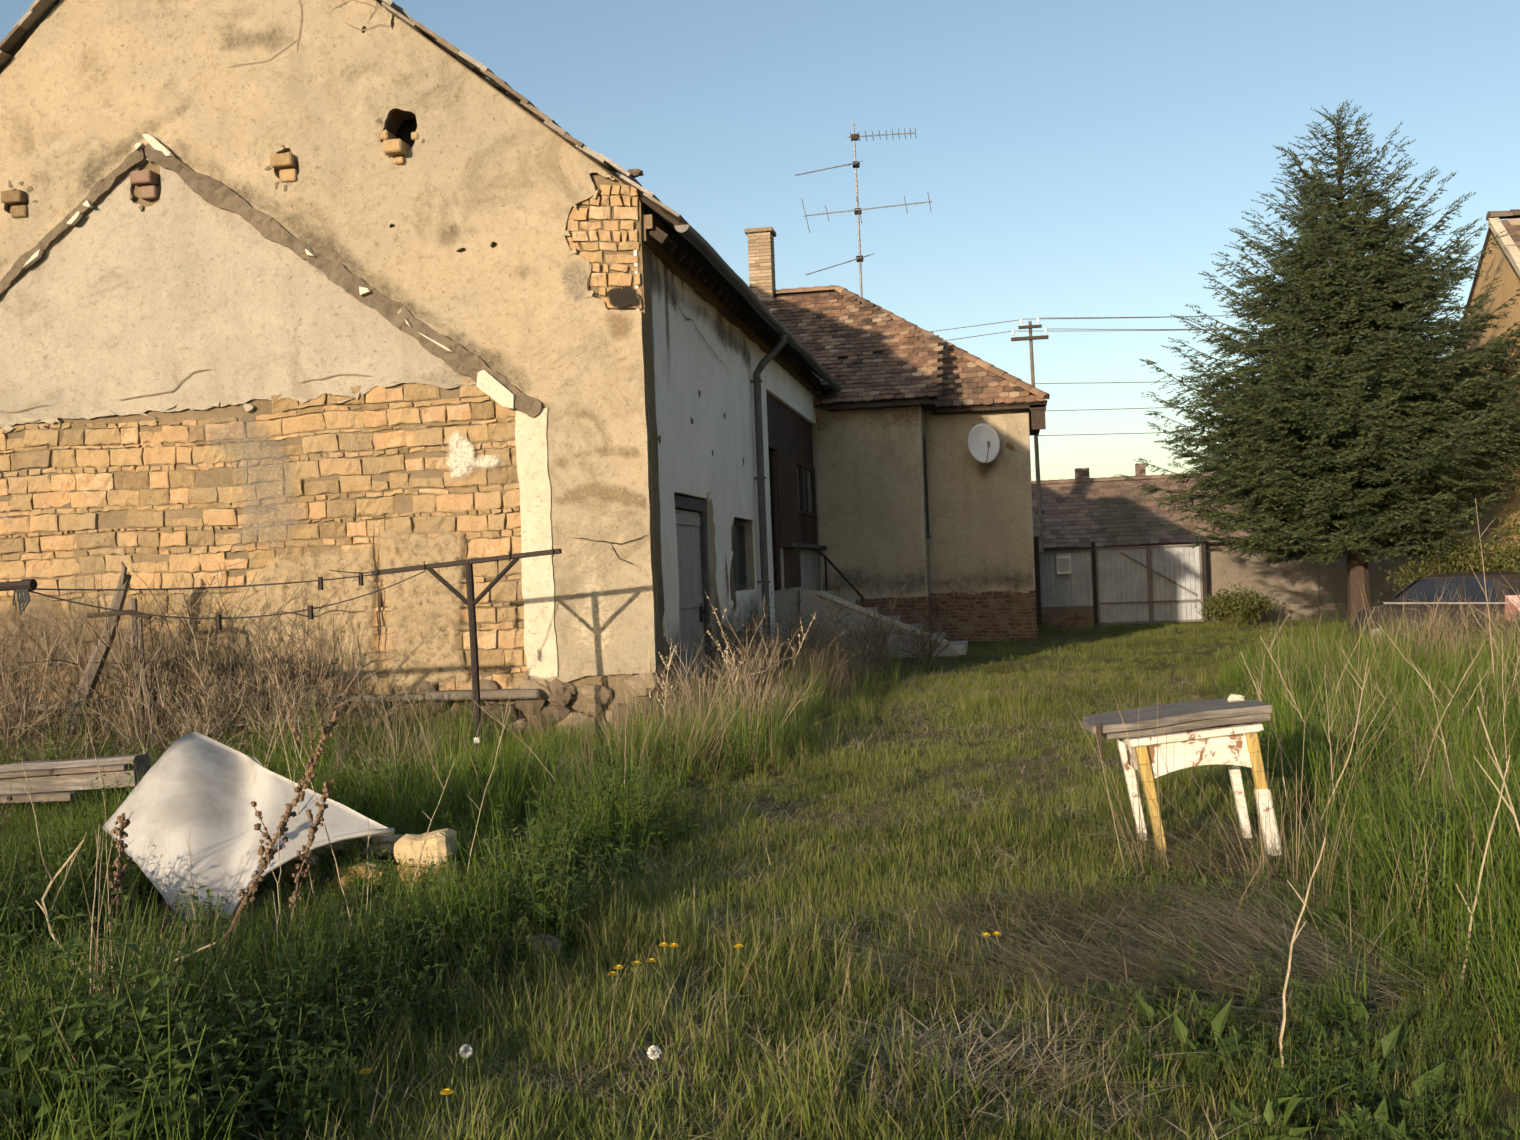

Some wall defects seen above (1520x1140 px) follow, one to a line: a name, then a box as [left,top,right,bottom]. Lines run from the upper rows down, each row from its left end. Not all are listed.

crack [228,0,410,68]
spalling [375,118,425,165]
flaking render [562,184,643,336]
flaking render [0,370,527,702]
crack [577,535,647,565]